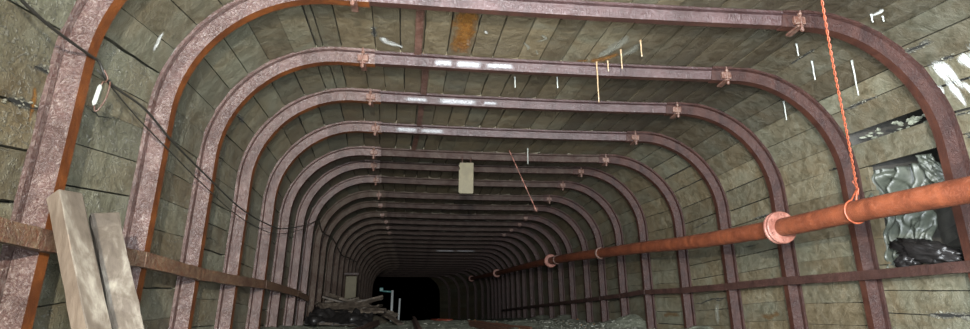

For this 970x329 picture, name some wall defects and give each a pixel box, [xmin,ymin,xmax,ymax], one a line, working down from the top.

rust [451,13,478,53]
leakage [932,54,970,105]